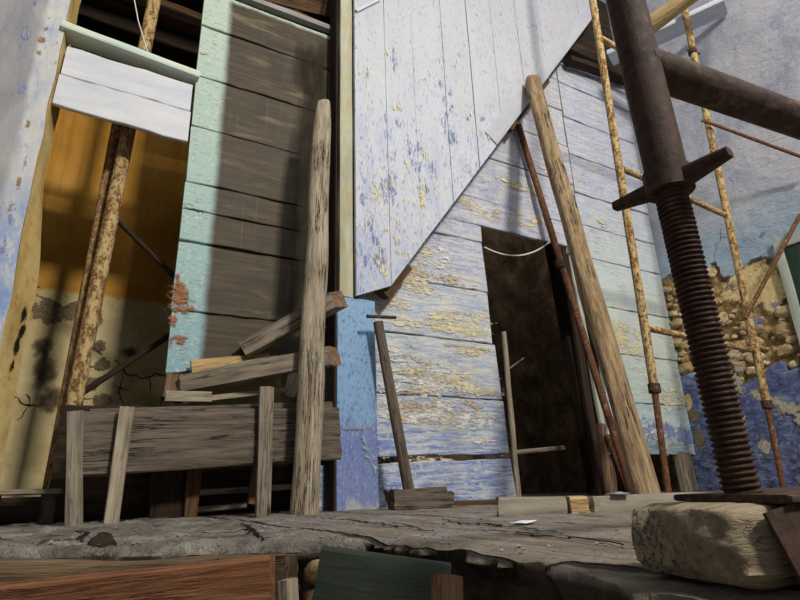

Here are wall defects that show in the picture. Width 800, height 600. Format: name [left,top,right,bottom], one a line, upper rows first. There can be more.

peeling [405,140,437,206]
peeling [455,196,545,229]
peeling [361,170,494,357]
crack [17,394,53,420]
damp [35,338,60,410]
crack [90,352,165,406]
peeling [375,346,390,419]
peeling [387,345,511,445]
flaking render [662,276,695,376]
flaking render [706,258,800,425]
peeling [757,439,771,454]